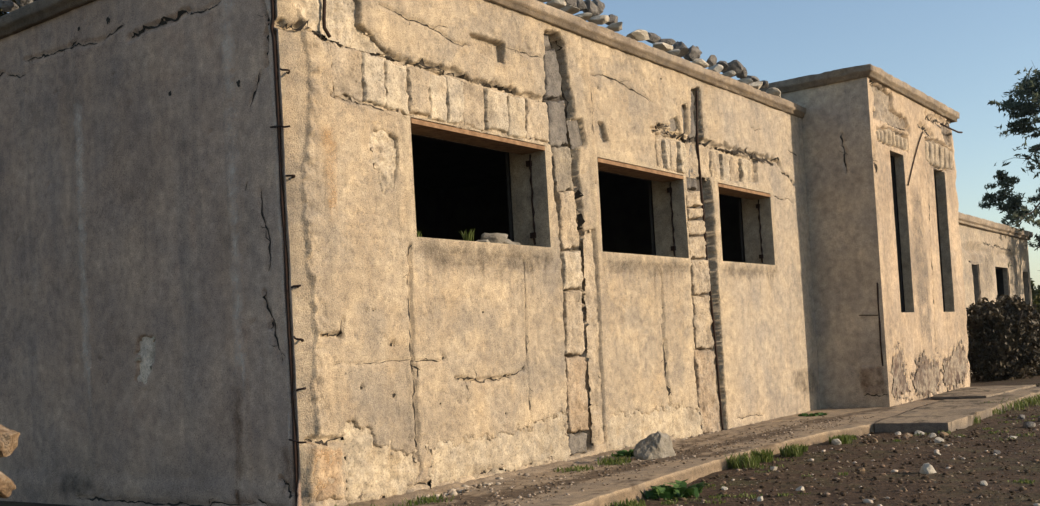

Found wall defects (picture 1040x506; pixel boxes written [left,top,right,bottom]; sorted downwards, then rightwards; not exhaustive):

crack [0,1,221,78]
crack [590,74,648,133]
crack [651,123,796,200]
crack [245,181,285,360]
spalling [270,0,307,506]
spalling [293,0,754,504]
spalling [135,336,156,384]
crack [335,245,532,447]
peeling [859,283,969,404]